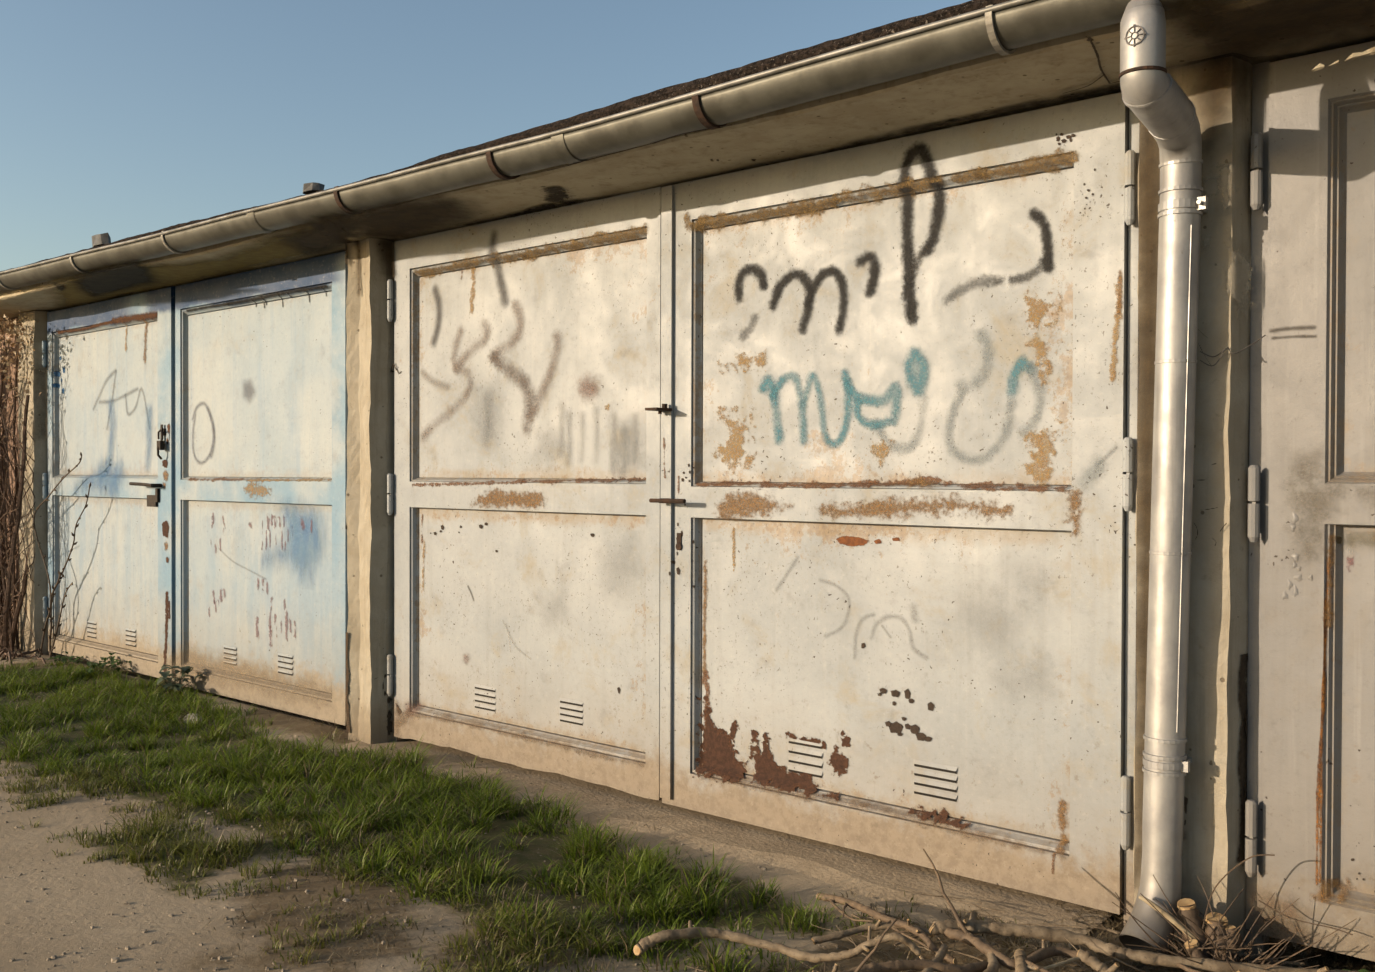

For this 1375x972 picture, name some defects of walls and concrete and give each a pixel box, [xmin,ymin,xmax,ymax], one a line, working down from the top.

rust [684,148,1078,234]
rust [414,223,647,313]
rust [717,352,766,373]
rust [1025,291,1062,384]
rust [412,477,646,508]
rust [696,406,1082,571]
rust [1313,535,1349,902]